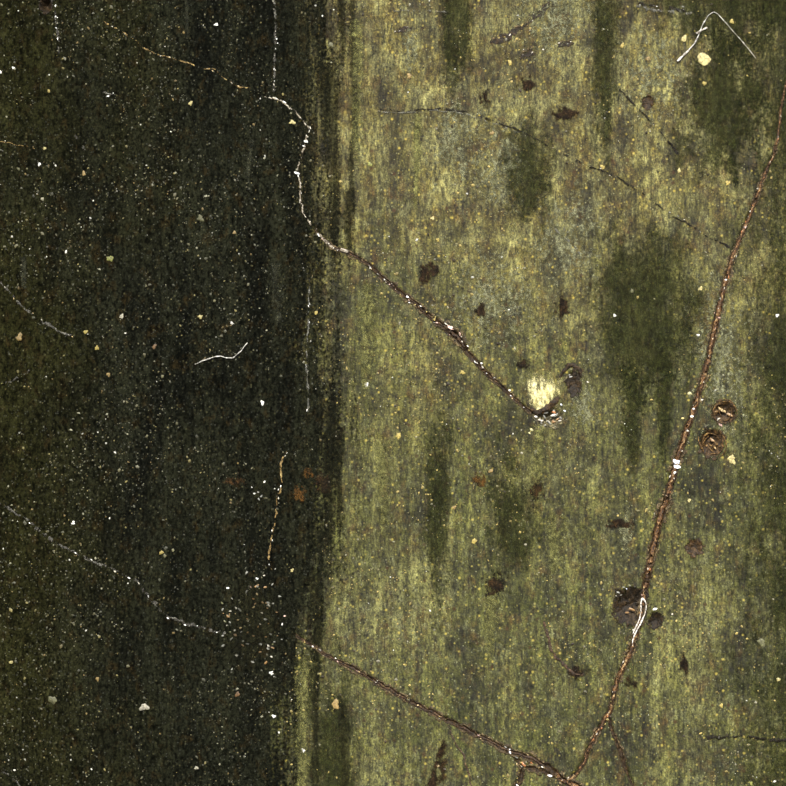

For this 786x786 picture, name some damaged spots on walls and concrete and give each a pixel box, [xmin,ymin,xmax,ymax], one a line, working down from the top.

leakage [506,0,597,65]
leakage [516,75,536,91]
leakage [552,106,579,121]
leakage [411,85,530,230]
leakage [418,262,444,284]
leakage [441,170,614,361]
crack [296,81,786,786]
leakage [621,352,673,471]
leakage [685,0,786,786]
leakage [606,500,635,556]
leakage [485,573,508,657]
leakage [680,652,688,676]